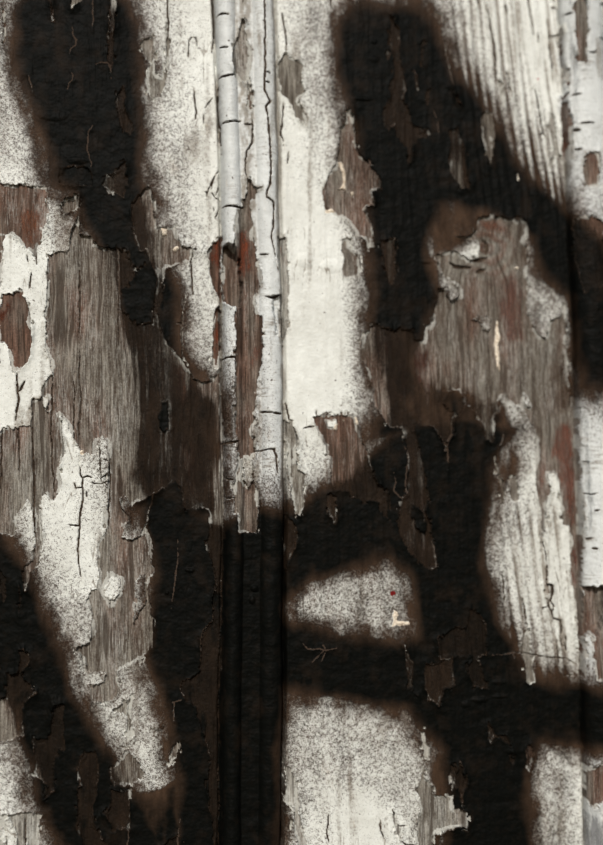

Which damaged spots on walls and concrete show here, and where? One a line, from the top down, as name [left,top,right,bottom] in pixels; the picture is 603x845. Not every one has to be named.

crack [188,0,289,270]
peeling [322,104,381,278]
peeling [546,0,603,188]
crack [72,266,83,444]
crack [0,374,111,577]
peeling [0,172,266,801]
peeling [309,412,372,486]
peeling [414,213,603,684]
crack [492,541,572,676]
peeling [0,809,44,845]
peeling [413,727,471,845]
peeling [581,759,603,813]